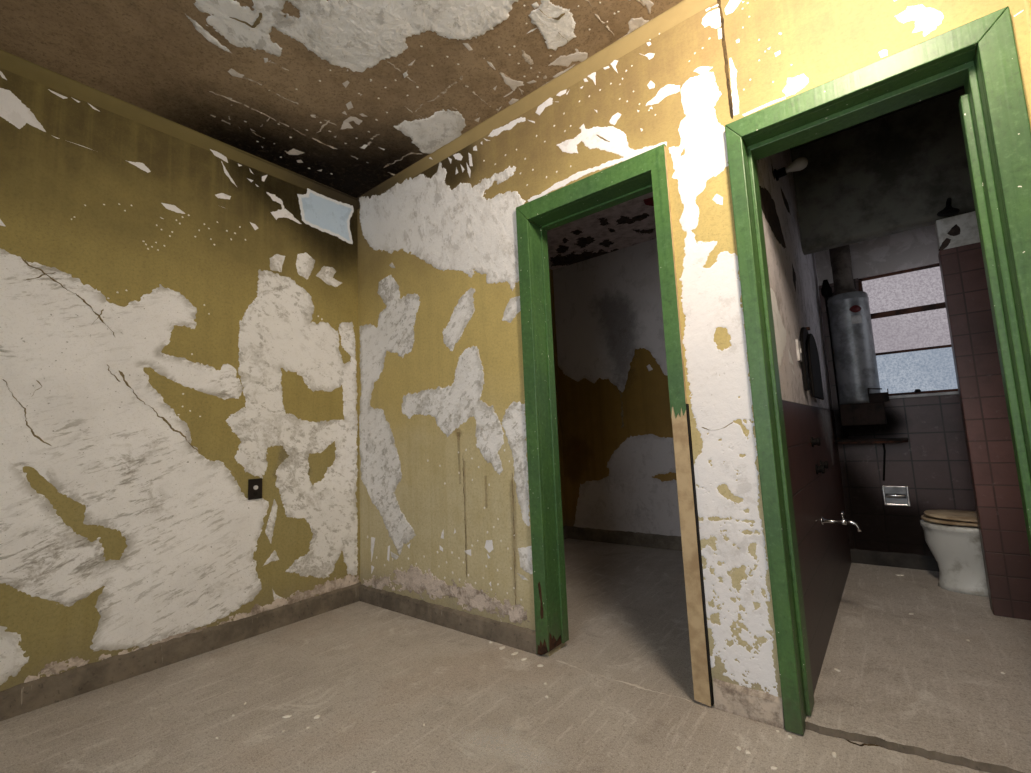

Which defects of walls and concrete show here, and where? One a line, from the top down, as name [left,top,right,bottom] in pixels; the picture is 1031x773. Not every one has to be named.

peeling [185,14,231,53]
peeling [702,0,744,39]
peeling [895,4,944,37]
peeling [0,71,92,150]
peeling [448,60,618,177]
peeling [487,49,588,113]
peeling [210,149,354,244]
peeling [269,252,342,287]
crack [3,379,51,446]
crack [107,365,200,452]
peeling [527,58,809,697]
flaking render [152,537,543,645]